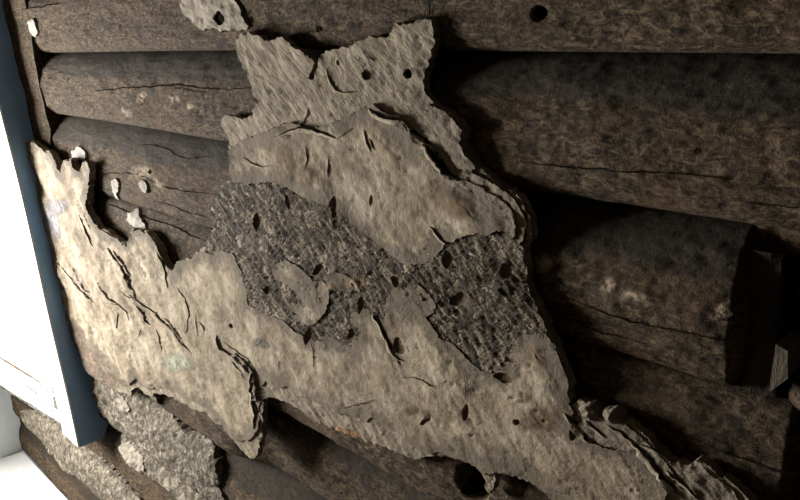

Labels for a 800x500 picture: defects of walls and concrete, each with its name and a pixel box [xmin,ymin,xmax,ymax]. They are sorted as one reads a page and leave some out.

spalling [27,19,39,38]
crack [326,60,355,95]
crack [274,108,459,180]
crack [242,157,271,169]
spalling [111,178,121,200]
crack [428,226,446,245]
spalling [442,250,453,268]
crack [52,171,257,429]
peeling [270,255,352,327]
spalling [450,291,467,306]
spalling [494,372,512,383]
peeling [118,441,145,472]